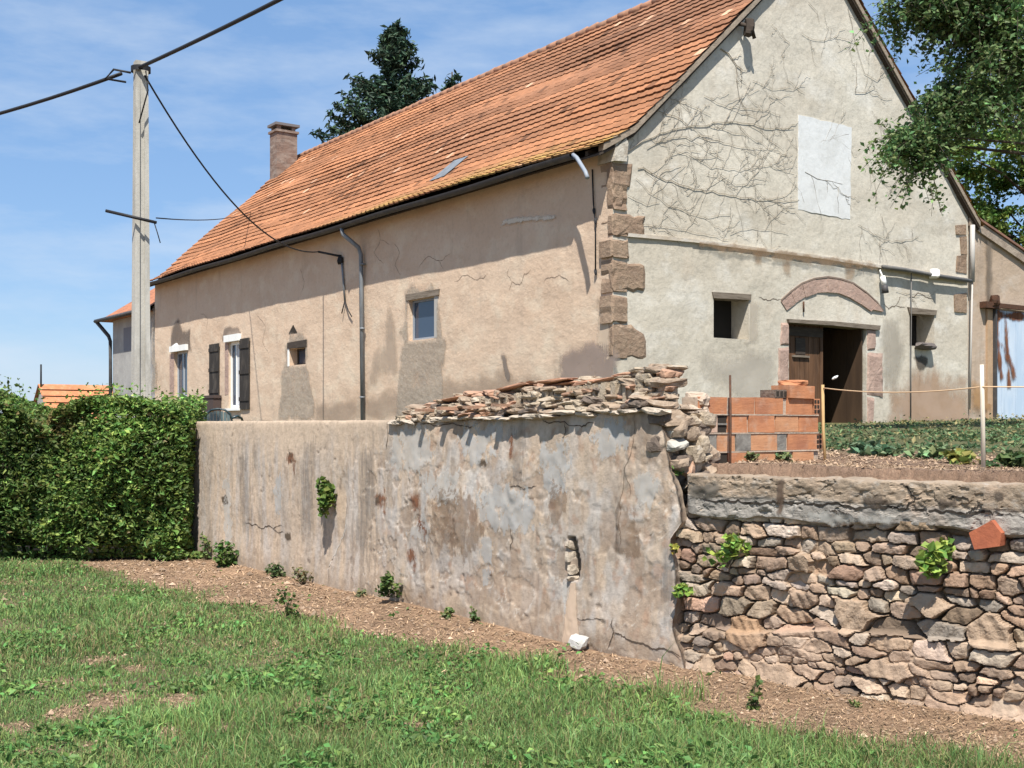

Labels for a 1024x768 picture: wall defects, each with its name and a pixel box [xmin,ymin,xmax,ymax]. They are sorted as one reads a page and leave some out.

crack [374,230,567,287]
rust [997,310,1024,386]
crack [618,424,635,546]
spalling [565,540,579,581]
crack [577,618,680,657]